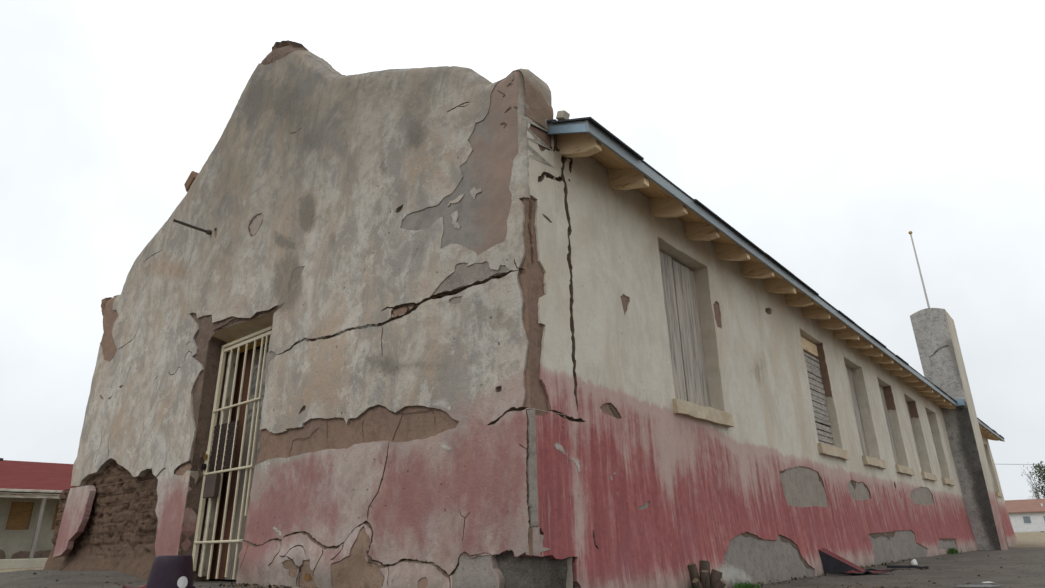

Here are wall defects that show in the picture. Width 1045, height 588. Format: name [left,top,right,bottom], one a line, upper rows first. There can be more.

peeling [398,71,550,416]
crack [277,259,525,356]
crack [488,147,585,543]
spalling [254,405,459,468]
peeling [600,403,621,419]
crack [240,444,492,588]
peeling [780,466,828,507]
spalling [496,528,575,588]
efflorescence [717,565,751,583]
peeling [724,532,814,588]
peeling [868,530,957,565]